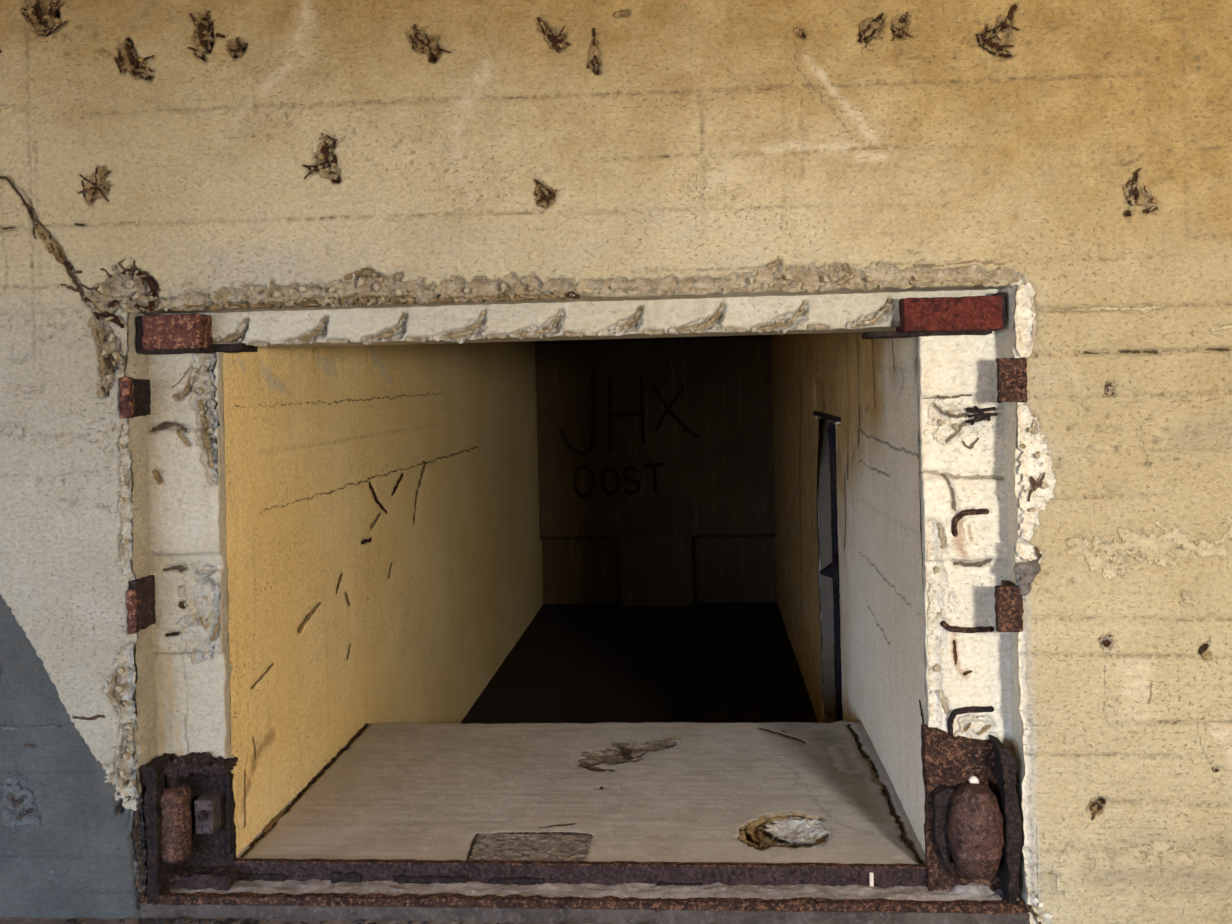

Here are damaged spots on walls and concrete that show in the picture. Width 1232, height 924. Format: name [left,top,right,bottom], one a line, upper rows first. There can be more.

spalling [118,38,152,80]
spalling [978,4,1017,58]
crack [0,176,94,310]
crack [78,171,111,204]
spalling [308,135,340,184]
spalling [80,257,1038,486]
spalling [116,424,133,575]
spalling [922,394,1056,596]
spalling [919,518,997,740]